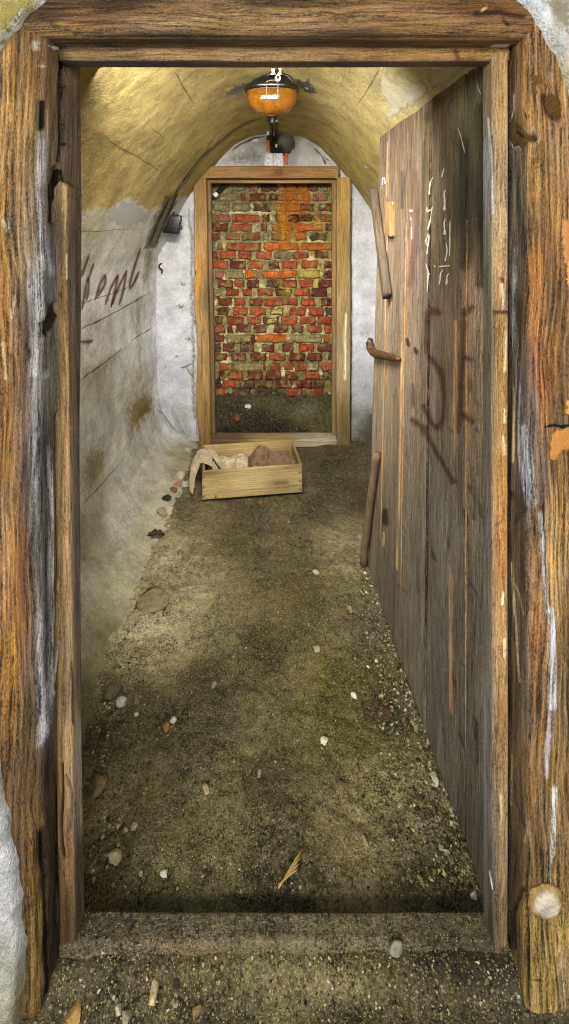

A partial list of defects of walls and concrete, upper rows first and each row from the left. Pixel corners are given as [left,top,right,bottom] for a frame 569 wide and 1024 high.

damp [128,392,152,434]